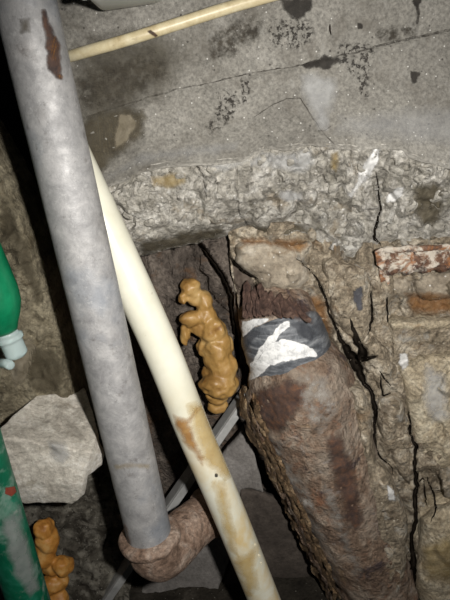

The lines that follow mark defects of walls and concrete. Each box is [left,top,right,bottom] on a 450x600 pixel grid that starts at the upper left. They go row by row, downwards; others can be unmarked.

mould [269,0,312,48]
water stain [78,42,170,169]
crack [254,98,334,144]
mould [303,44,373,97]
efflorescence [349,149,380,197]
crack [373,174,382,244]
spalling [108,142,450,430]
crack [296,258,393,474]
spalling [125,316,189,498]
spalling [219,402,258,451]
spalling [252,443,285,510]
crack [408,412,437,586]